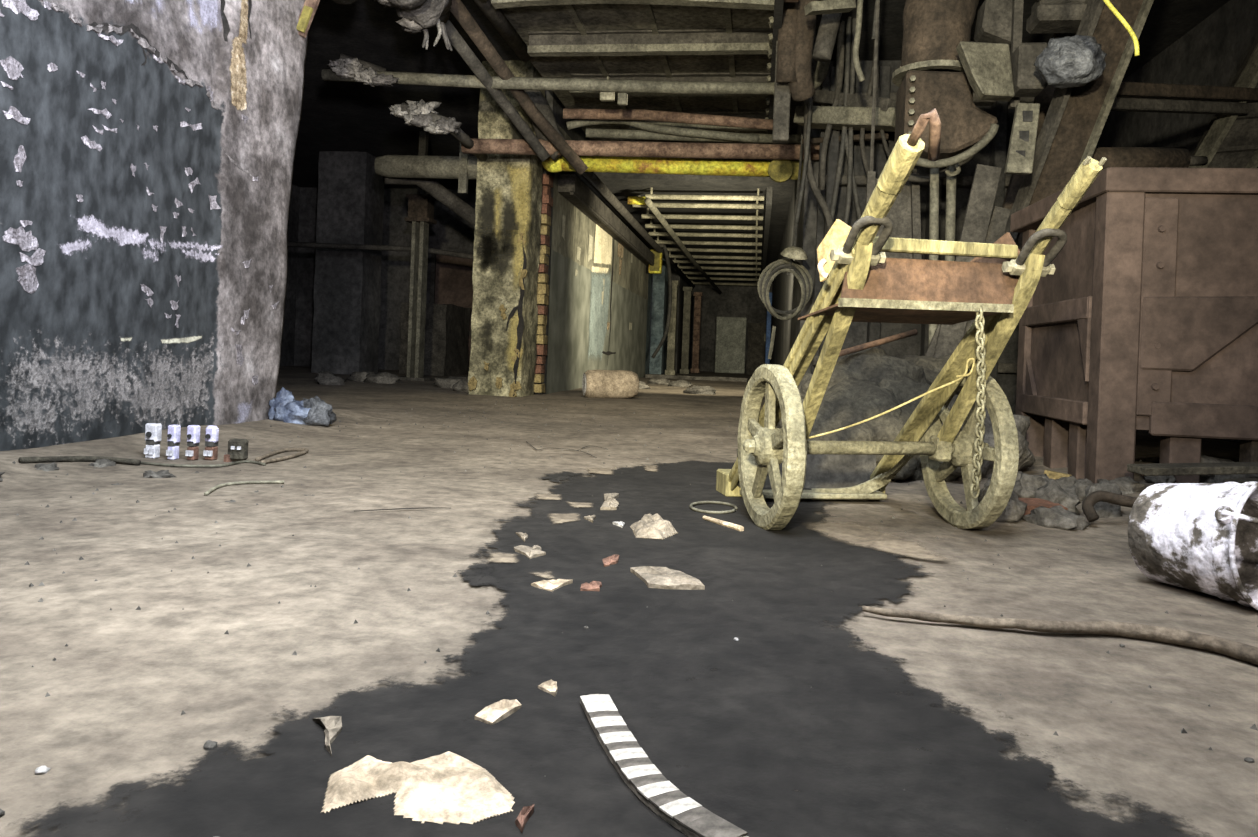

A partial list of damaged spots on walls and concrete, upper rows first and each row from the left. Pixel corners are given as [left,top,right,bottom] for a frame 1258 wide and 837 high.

damp [187,0,218,32]
peeling [2,106,30,125]
peeling [76,71,158,151]
peeling [180,108,202,131]
peeling [14,145,26,187]
peeling [2,220,46,294]
damp [61,216,221,262]
peeling [160,167,221,243]
damp [477,168,529,281]
damp [483,322,492,350]
damp [509,313,519,374]
damp [6,336,223,442]